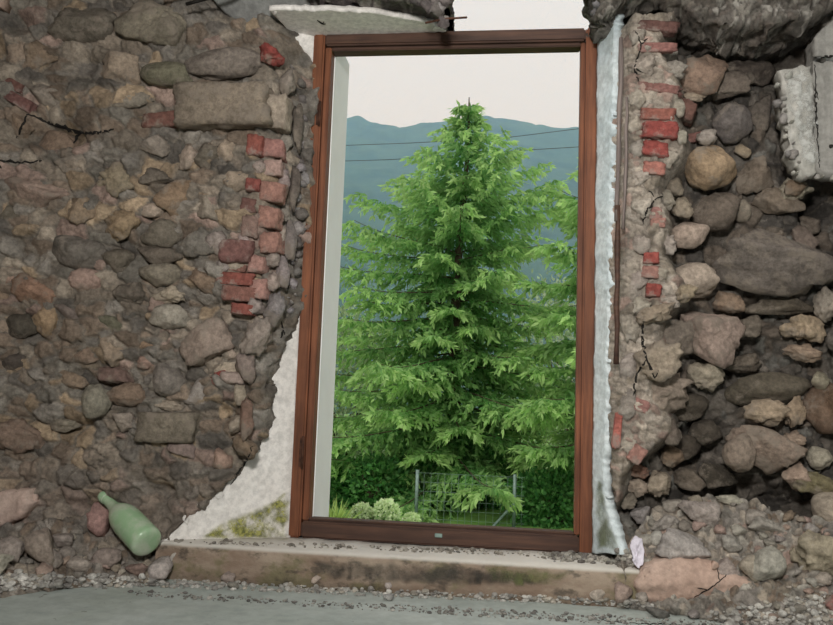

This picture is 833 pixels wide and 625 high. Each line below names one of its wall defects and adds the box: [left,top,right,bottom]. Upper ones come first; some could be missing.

crack [0,159,42,168]
crack [16,114,114,143]
spalling [772,71,833,182]
flaking render [592,14,630,555]
flaking render [164,141,310,541]
flaking render [0,488,40,527]